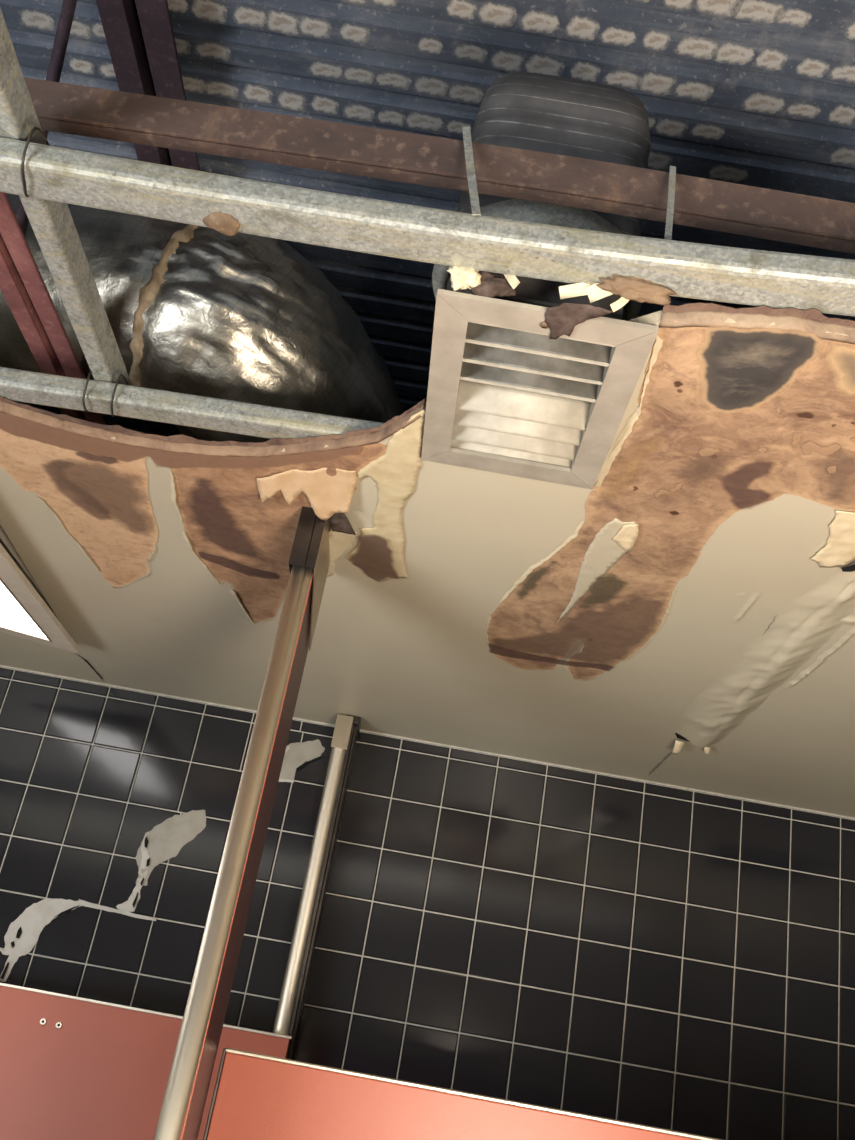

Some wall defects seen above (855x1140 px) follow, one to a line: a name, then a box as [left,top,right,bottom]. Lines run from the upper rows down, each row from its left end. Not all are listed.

rust [21,10,54,30]
rust [70,21,106,39]
rust [167,0,370,43]
rust [69,58,116,77]
rust [310,62,484,103]
rust [418,38,714,101]
rust [182,76,472,133]
rust [648,118,725,140]
rust [744,93,855,125]
water stain [698,327,855,413]
peeling [0,396,425,624]
peeling [485,302,855,681]